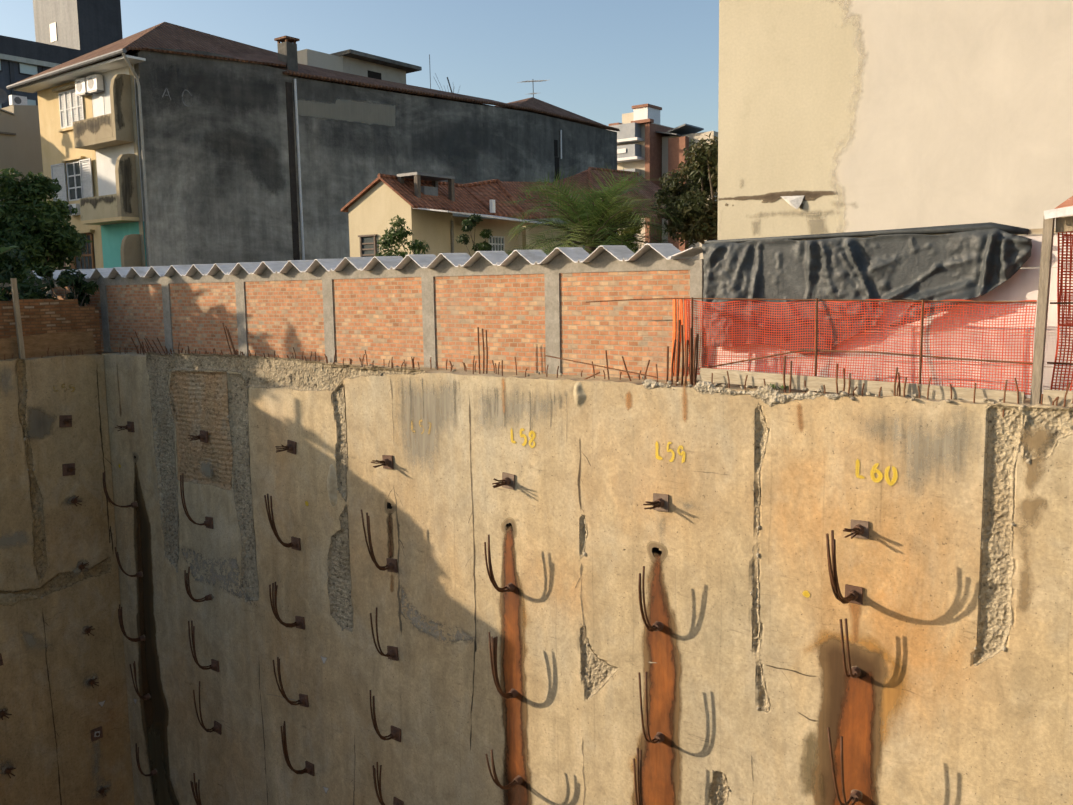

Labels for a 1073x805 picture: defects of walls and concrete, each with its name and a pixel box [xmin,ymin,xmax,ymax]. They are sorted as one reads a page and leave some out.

spalling [0,354,111,599]
spalling [119,323,527,632]
spalling [545,320,865,713]
spalling [879,367,931,399]
spalling [973,378,1073,666]
rust [499,528,532,805]
rust [632,556,681,805]
spalling [709,770,730,805]
rust [801,604,904,805]